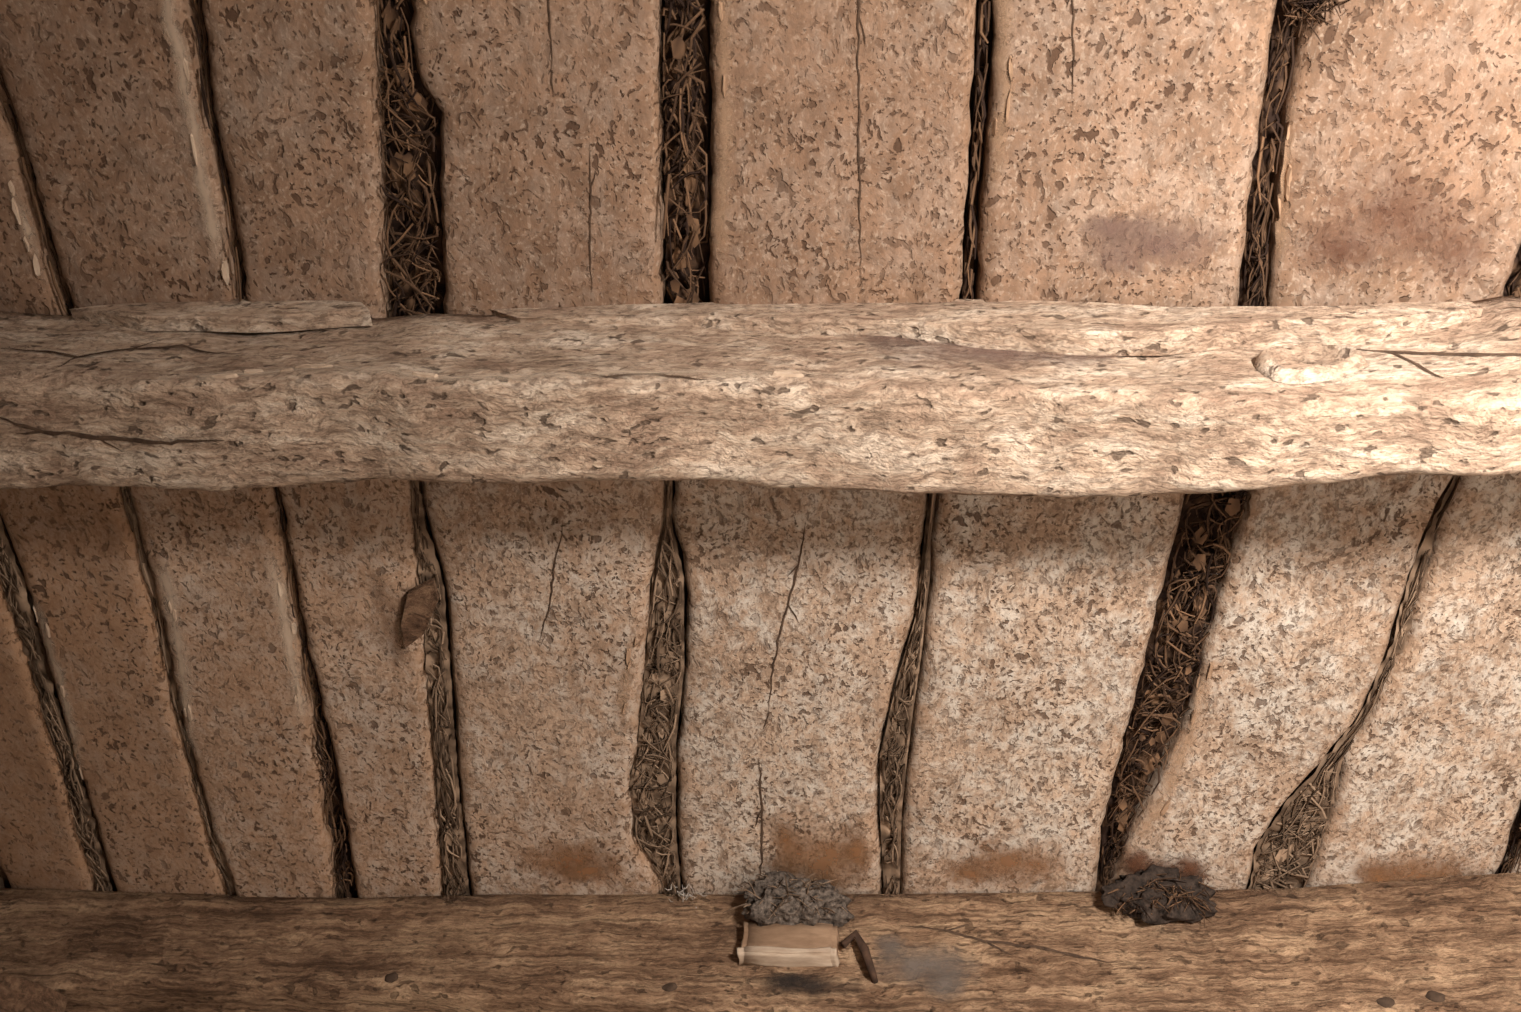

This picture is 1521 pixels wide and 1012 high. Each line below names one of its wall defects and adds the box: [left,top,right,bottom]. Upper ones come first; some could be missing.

crack [10,341,237,367]
crack [1355,348,1521,378]